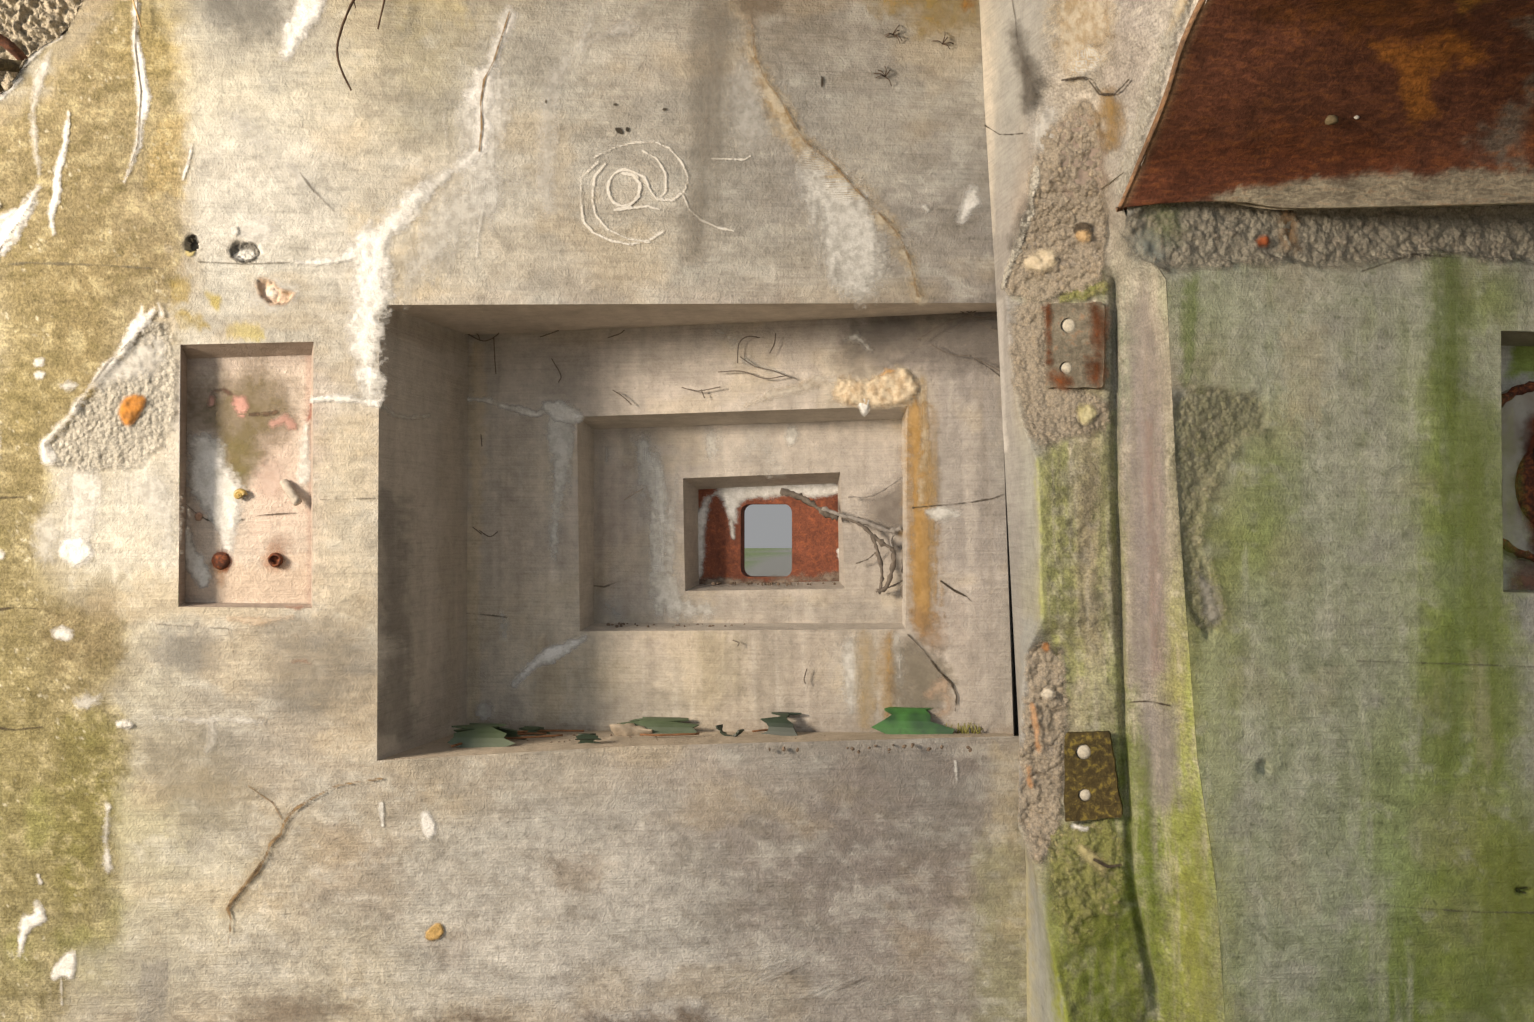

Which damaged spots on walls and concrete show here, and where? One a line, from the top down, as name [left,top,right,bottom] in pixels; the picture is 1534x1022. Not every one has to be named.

spalling [0,0,84,96]
leakage [0,112,70,255]
crack [752,33,922,300]
spalling [1001,0,1534,444]
spalling [40,306,176,472]
rust [1044,305,1071,388]
rust [904,378,959,636]
leakage [53,626,72,640]
rust [843,638,902,712]
crack [226,778,383,932]
leakage [18,902,46,953]
leakage [51,953,76,1005]